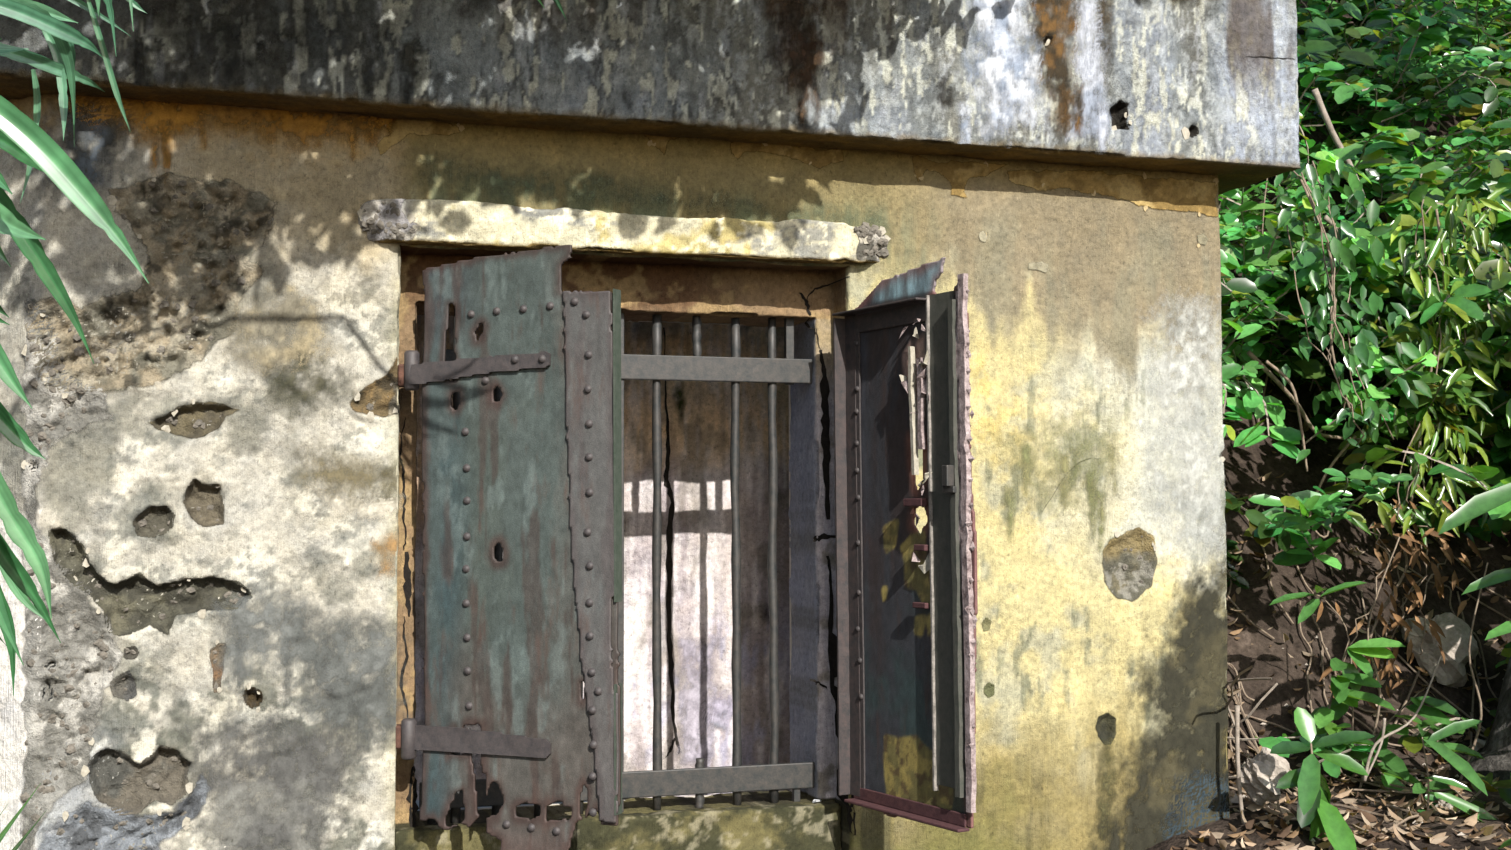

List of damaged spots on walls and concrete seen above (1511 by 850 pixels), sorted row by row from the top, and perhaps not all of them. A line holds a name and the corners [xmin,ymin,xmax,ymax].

corrosion [69,95,394,167]
leakage [765,0,825,133]
leakage [939,0,1041,144]
corrosion [1031,0,1083,152]
spalling [1109,100,1132,130]
spalling [350,358,400,422]
spalling [19,172,277,850]
crack [799,276,856,835]
leakage [1006,435,1116,535]
spalling [1102,527,1157,602]
leakage [1092,304,1230,850]
spalling [1096,713,1116,745]